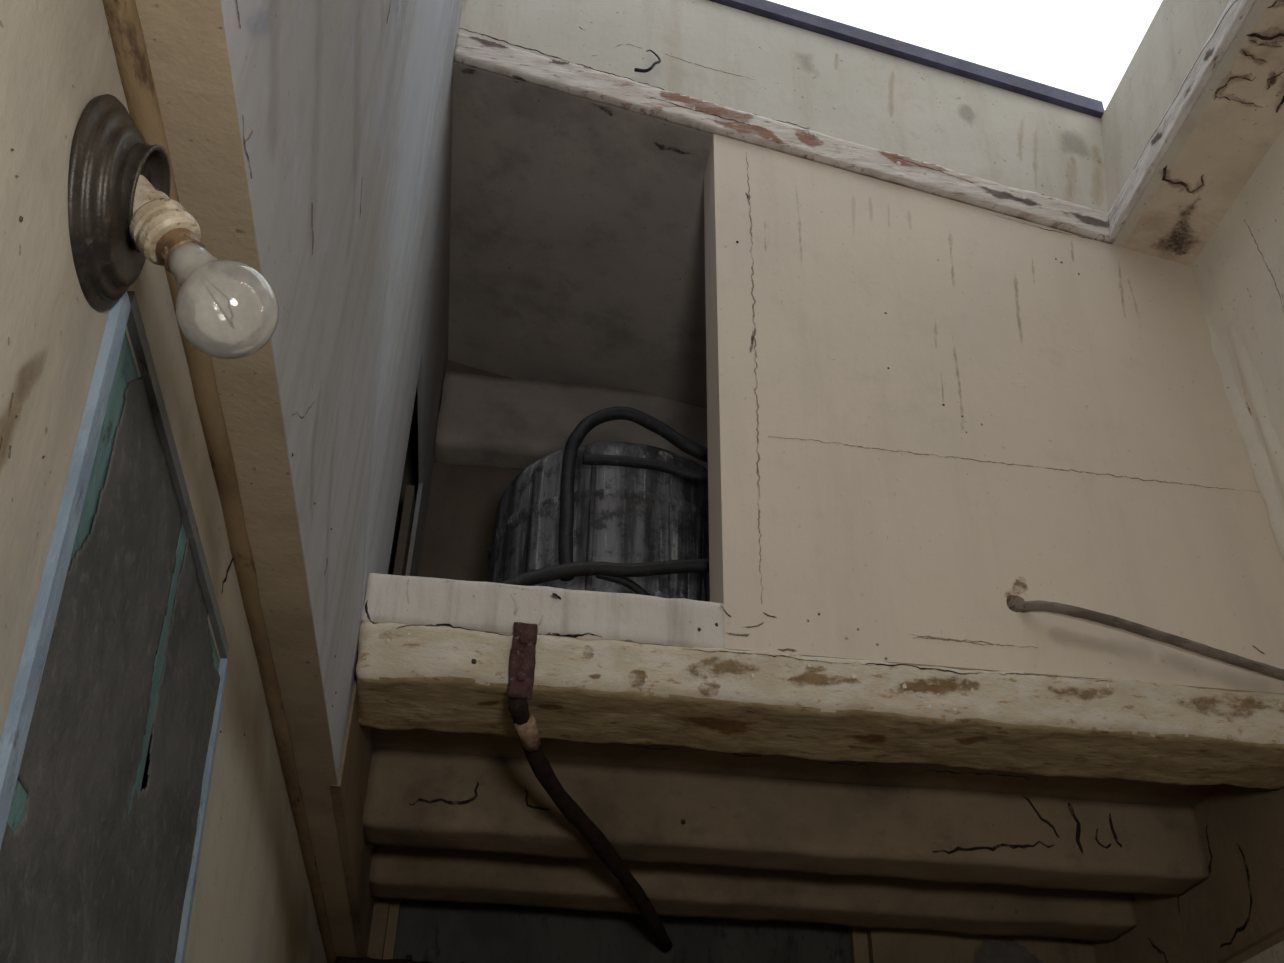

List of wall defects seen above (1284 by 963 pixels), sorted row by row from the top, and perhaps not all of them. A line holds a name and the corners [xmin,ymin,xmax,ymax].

peeling [660,92,823,149]
crack [1134,0,1284,193]
peeling [880,152,942,174]
peeling [981,187,1042,206]
peeling [1064,210,1109,227]
crack [365,28,1233,682]
crack [924,770,1122,854]
crack [1206,825,1252,948]